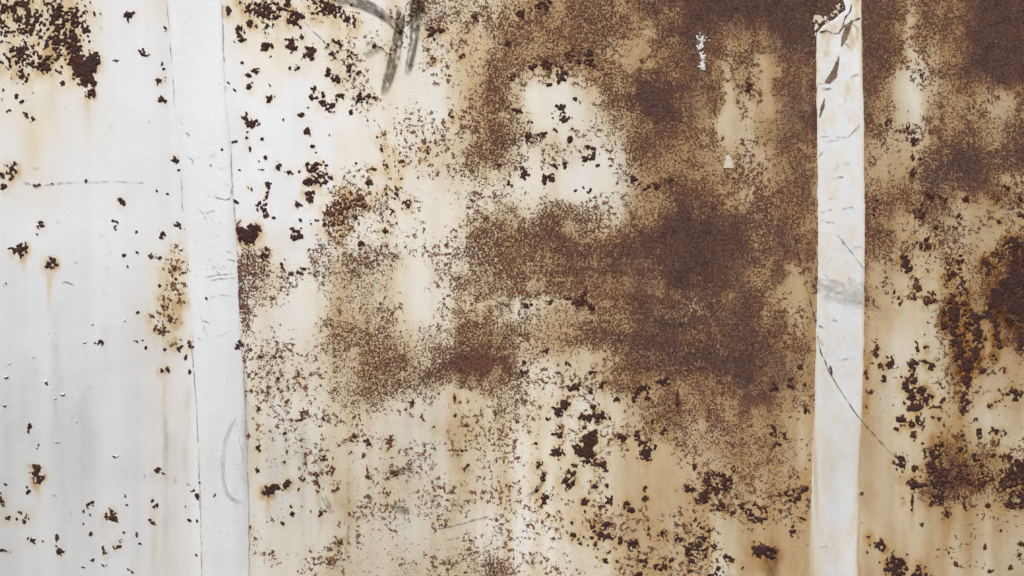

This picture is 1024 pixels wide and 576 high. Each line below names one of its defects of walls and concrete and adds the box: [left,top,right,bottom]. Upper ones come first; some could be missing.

corrosion [0,0,119,121]
corrosion [122,221,194,374]
corrosion [221,0,846,576]
corrosion [861,0,1024,576]
corrosion [0,483,29,524]
corrosion [25,464,45,495]
corrosion [27,534,65,556]
corrosion [81,494,141,568]